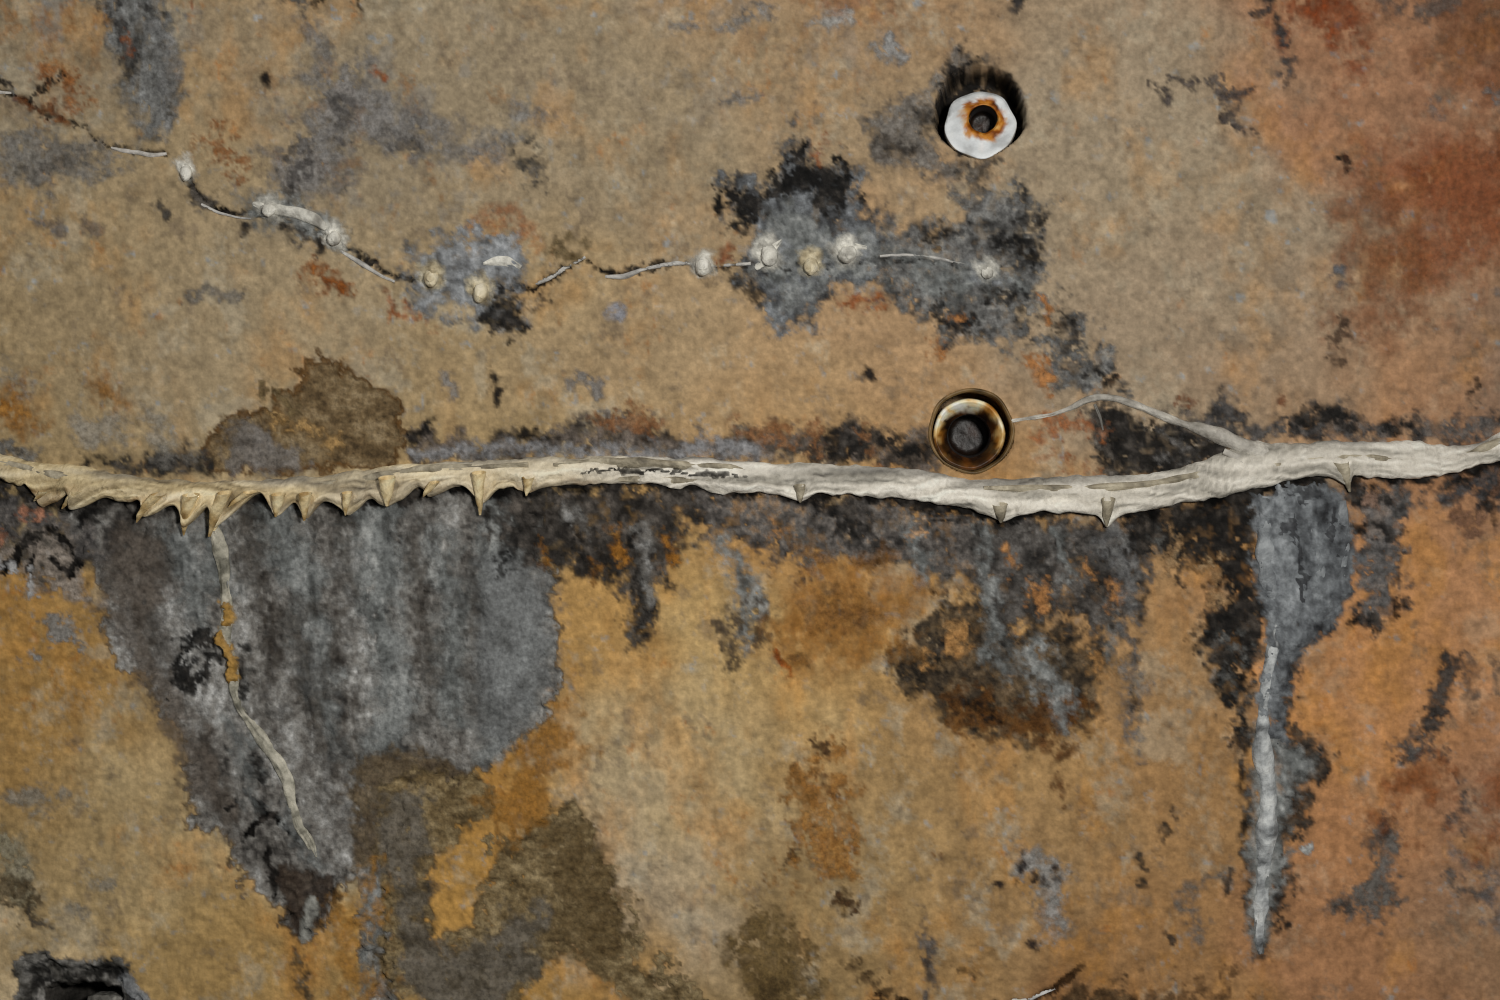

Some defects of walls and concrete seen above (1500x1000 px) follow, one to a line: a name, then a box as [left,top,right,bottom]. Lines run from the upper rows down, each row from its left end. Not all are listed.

crack [0,73,1001,345]
crack [0,394,1500,537]
leakage [712,48,1500,476]
leakage [202,515,322,870]
flaking render [0,487,709,1000]
leakage [481,466,1500,959]